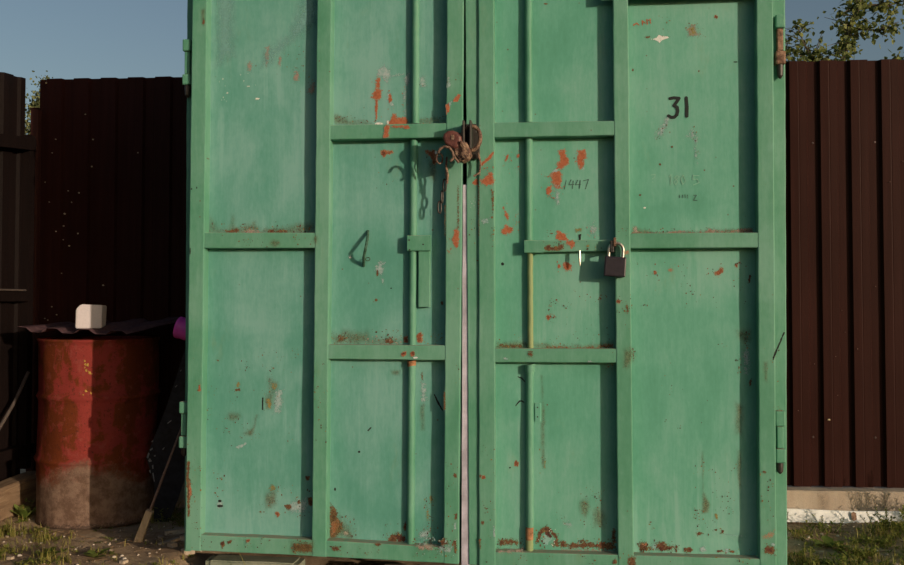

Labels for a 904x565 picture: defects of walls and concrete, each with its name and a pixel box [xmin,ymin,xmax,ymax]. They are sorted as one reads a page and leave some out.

rust [209,223,316,246]
rust [331,329,443,344]
rust [330,505,356,557]
rust [365,495,457,555]
rust [479,501,527,561]
rust [534,487,636,565]